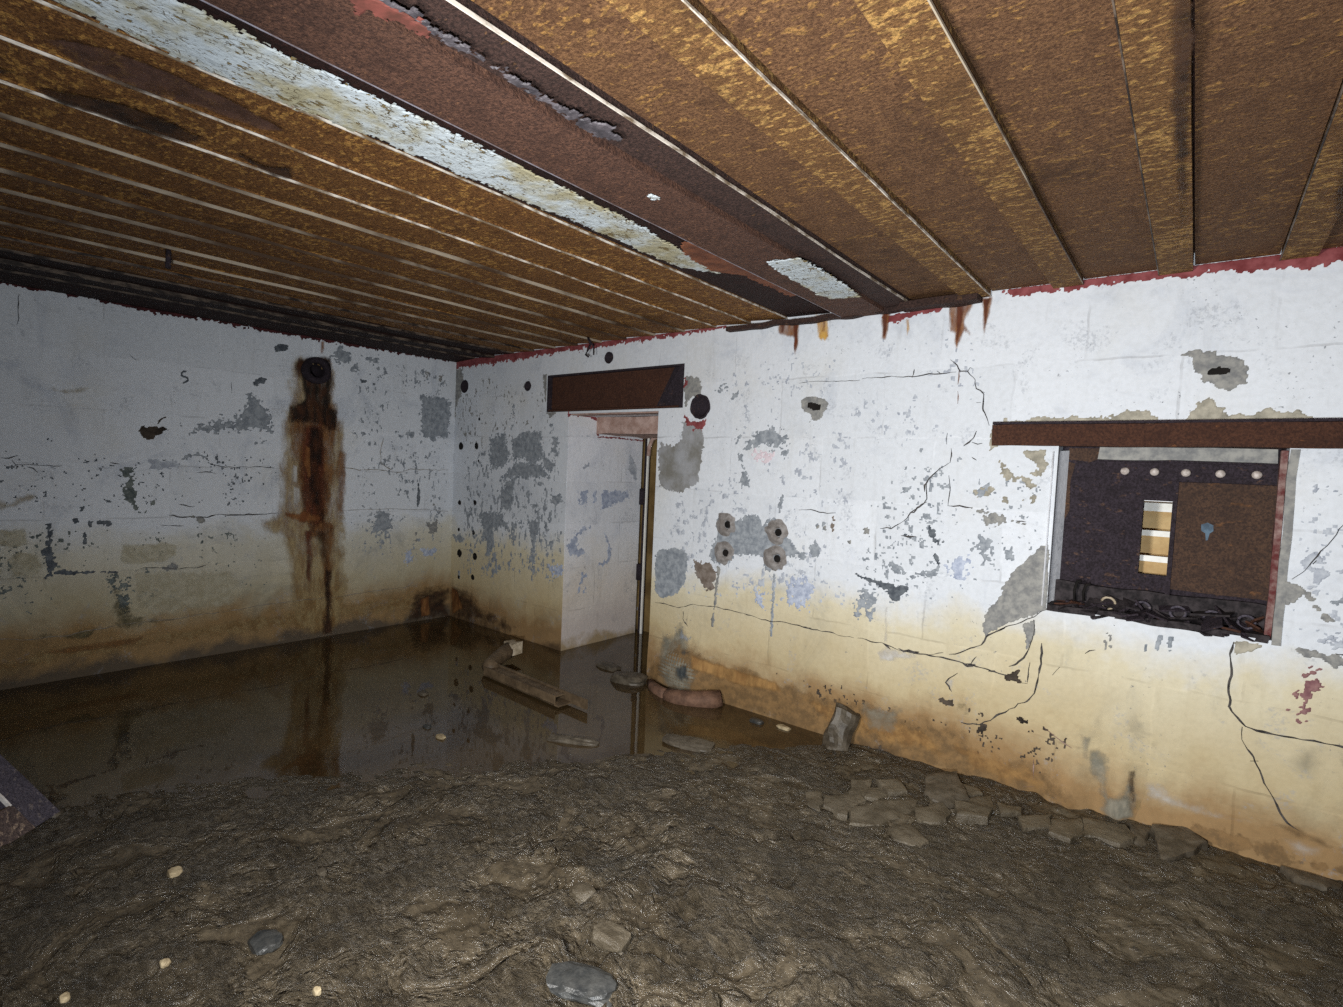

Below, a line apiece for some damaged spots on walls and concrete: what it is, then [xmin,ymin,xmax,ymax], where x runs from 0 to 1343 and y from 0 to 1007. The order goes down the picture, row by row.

peeling [53,0,720,274]
peeling [0,377,276,614]
corrosion [266,342,345,633]
peeling [329,345,644,594]
peeling [654,353,1158,649]
corrosion [950,298,991,346]
spalling [1181,349,1313,420]
leakage [412,588,506,628]
crack [655,602,1094,787]
leakage [1104,772,1134,820]
leakage [1191,824,1290,865]
crack [1227,642,1343,831]